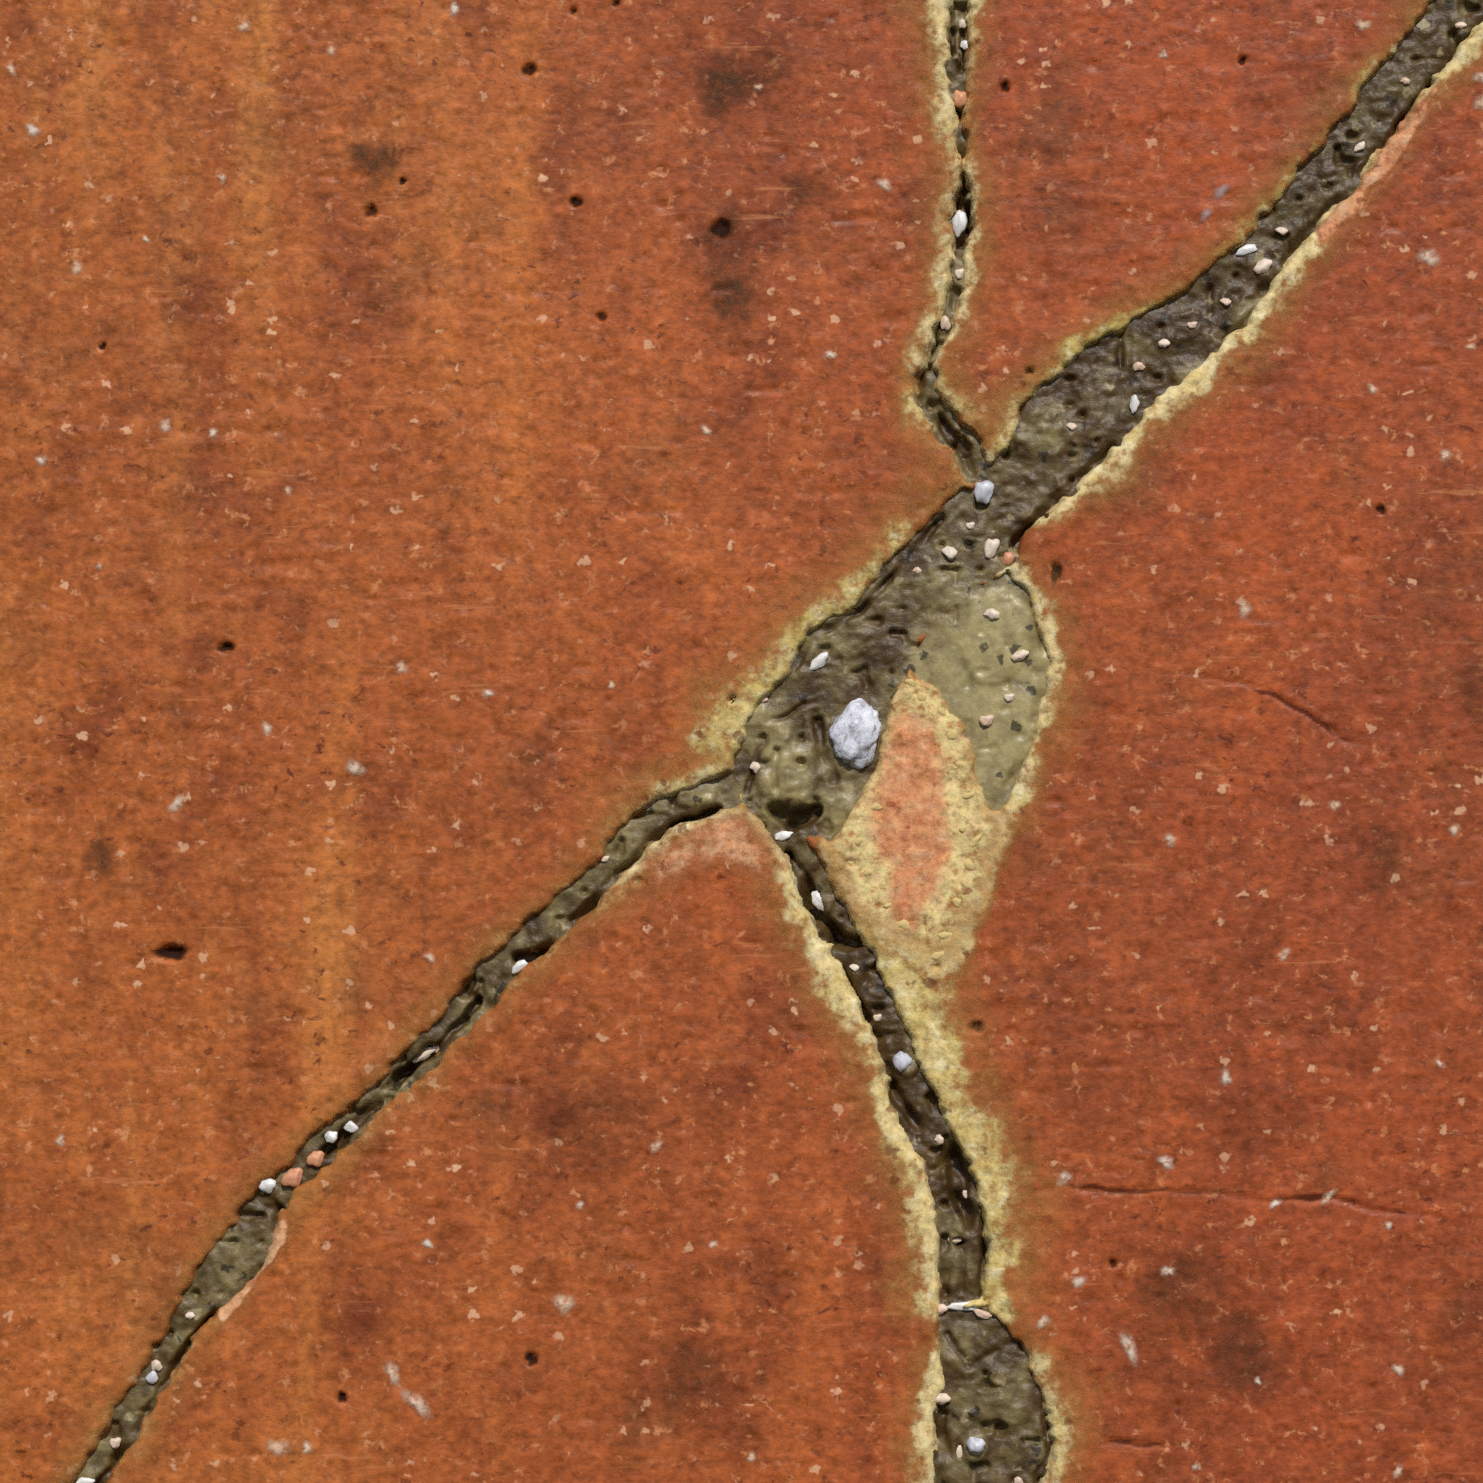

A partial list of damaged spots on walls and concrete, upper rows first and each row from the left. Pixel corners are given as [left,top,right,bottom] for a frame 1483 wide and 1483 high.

crack [916,0,1483,559]
crack [1255,690,1331,731]
peeling [832,573,1051,960]
crack [75,489,1019,1483]
crack [1085,1184,1164,1193]
crack [1295,1193,1325,1201]
crack [1112,1439,1160,1447]